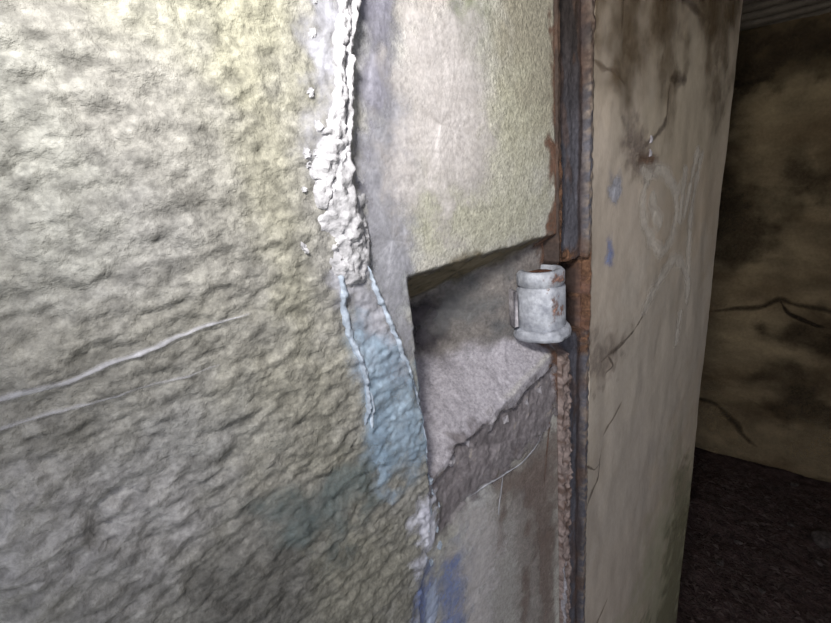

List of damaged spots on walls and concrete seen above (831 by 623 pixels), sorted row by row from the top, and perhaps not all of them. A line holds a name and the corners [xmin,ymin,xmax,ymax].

crack [646,76,686,144]
water stain [301,0,497,463]
rust [533,136,592,283]
crack [0,316,242,401]
spalling [431,366,558,540]
rust [538,343,558,481]
rust [571,294,591,352]
crack [730,299,831,328]
water stain [407,473,503,623]